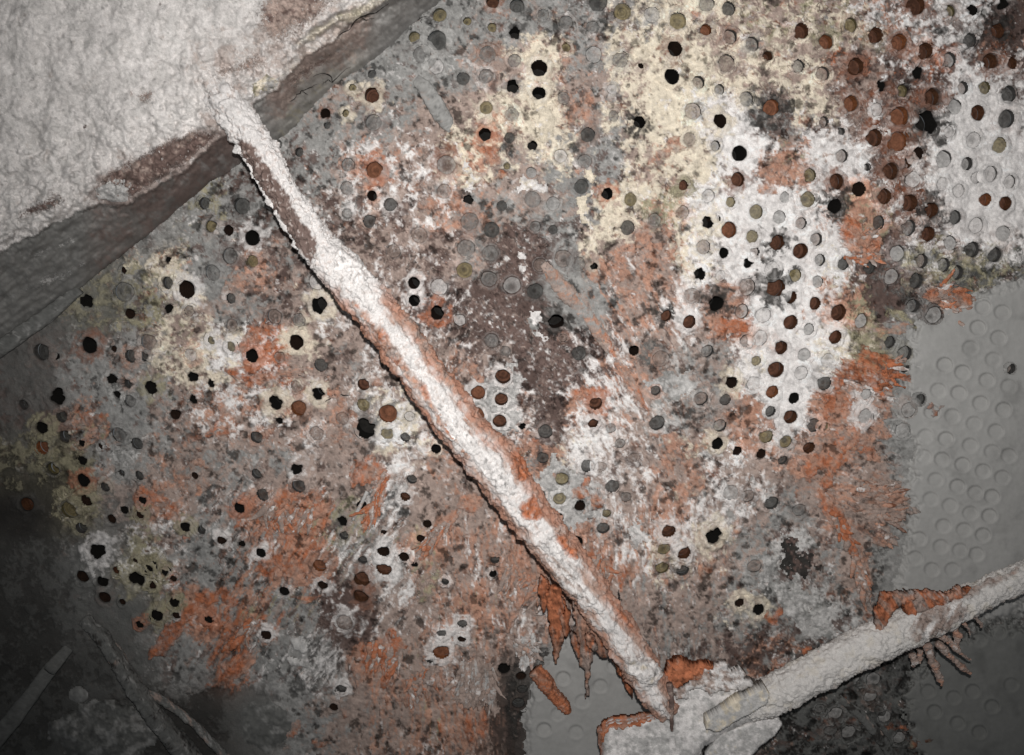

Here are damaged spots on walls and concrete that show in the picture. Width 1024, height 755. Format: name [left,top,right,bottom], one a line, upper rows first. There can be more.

water stain [487,226,551,286]
rust [824,213,886,302]
rust [135,396,237,520]
rust [248,486,331,541]
rust [349,452,391,533]
rust [411,491,484,563]
rust [799,321,1021,631]
rust [554,521,637,630]
rust [148,584,240,660]
rust [216,612,268,684]
rust [359,627,439,712]
rust [664,655,714,688]